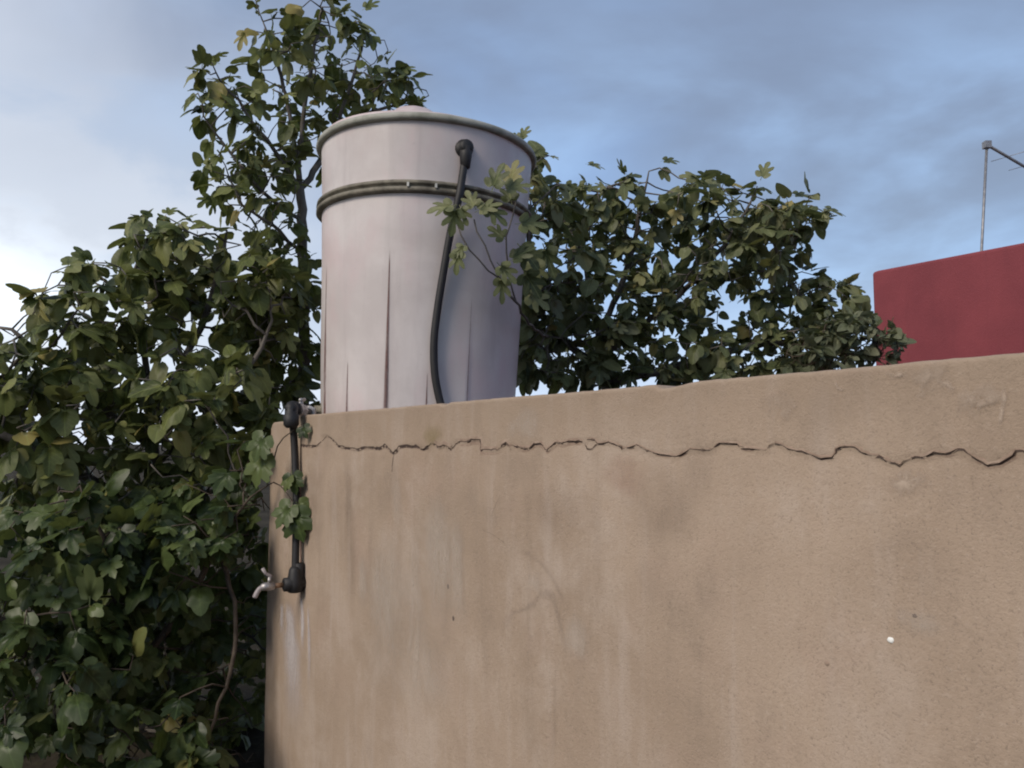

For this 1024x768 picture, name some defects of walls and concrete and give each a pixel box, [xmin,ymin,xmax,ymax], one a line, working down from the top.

crack [300,436,1024,497]